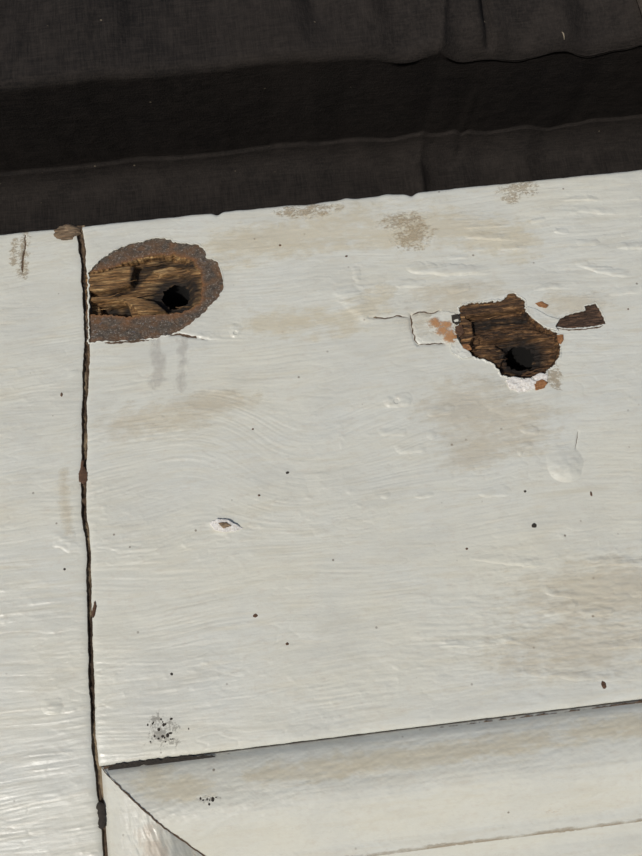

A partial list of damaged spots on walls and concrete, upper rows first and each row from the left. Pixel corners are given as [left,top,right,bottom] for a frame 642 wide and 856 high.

peeling [85,236,225,345]
peeling [413,291,607,392]